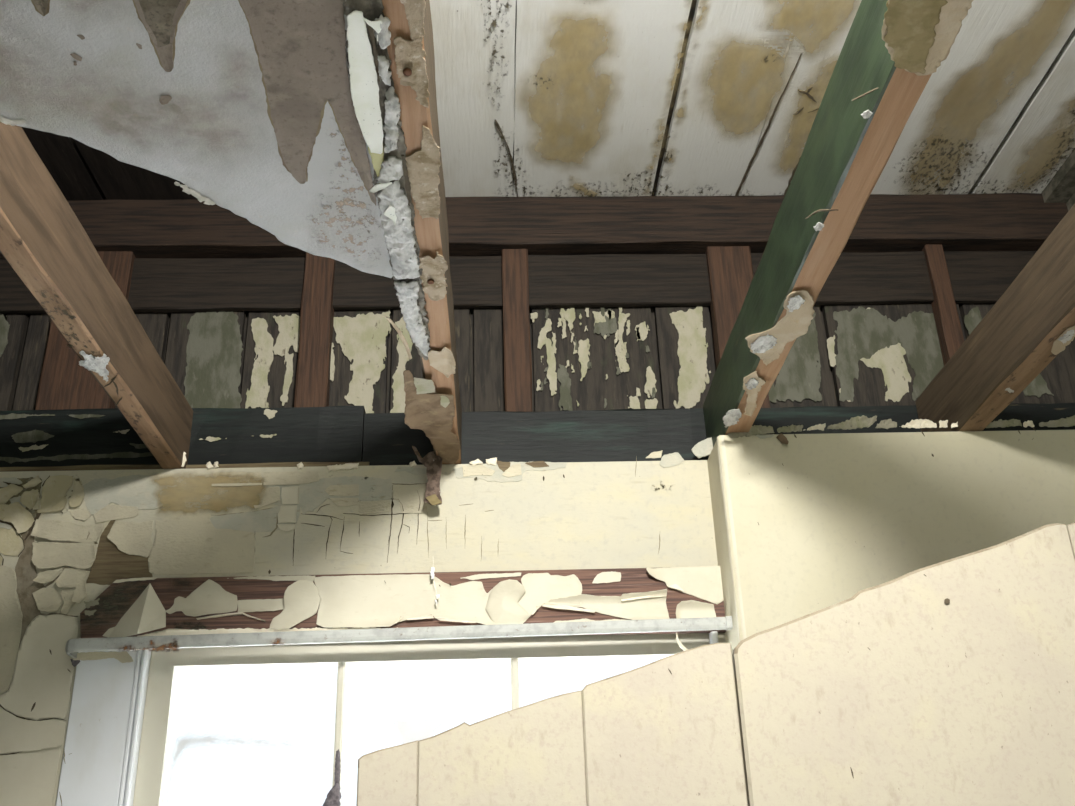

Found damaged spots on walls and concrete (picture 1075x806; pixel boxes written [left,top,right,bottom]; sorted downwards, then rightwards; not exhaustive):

peeling [346,10,392,193]
damp [527,18,611,163]
damp [707,0,854,134]
damp [899,0,1075,195]
peeling [330,311,413,413]
peeling [669,306,711,409]
crack [0,513,41,565]
crack [42,532,98,617]
damp [154,475,265,513]
crack [293,483,499,562]
peeling [0,471,724,806]
crack [0,689,66,721]